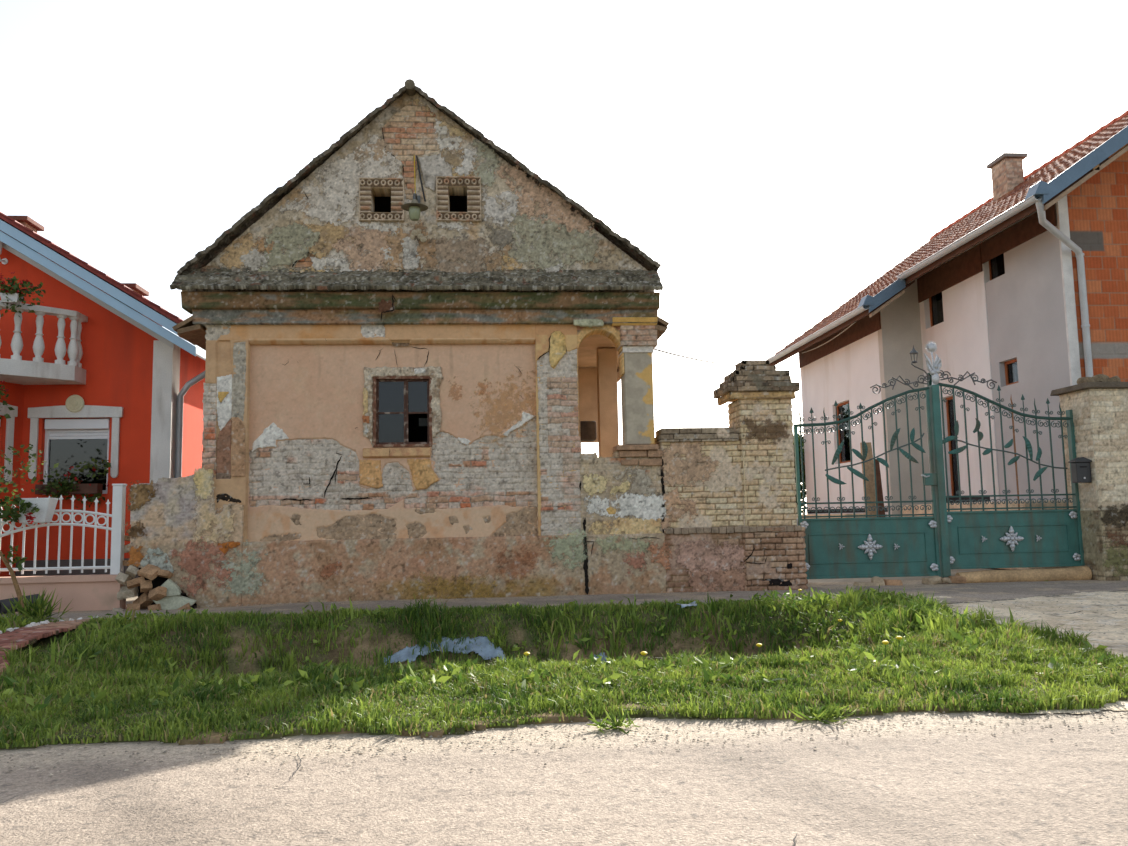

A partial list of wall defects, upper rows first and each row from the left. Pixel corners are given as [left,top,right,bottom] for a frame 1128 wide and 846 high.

peeling [203,99,601,273]
spalling [192,325,666,543]